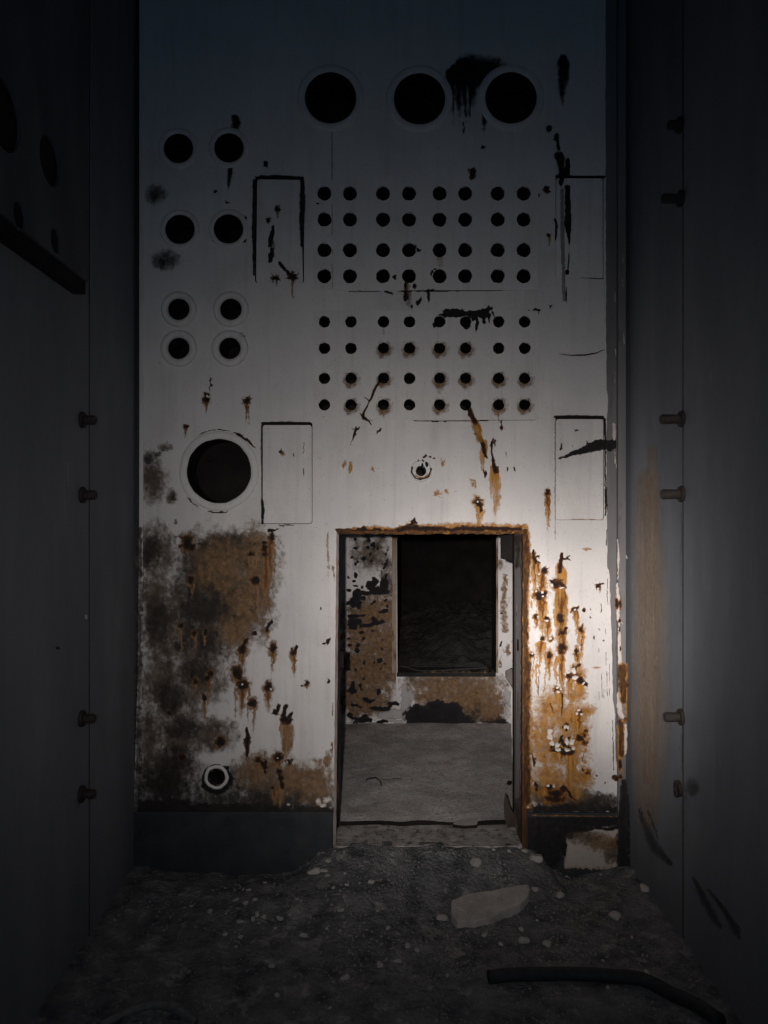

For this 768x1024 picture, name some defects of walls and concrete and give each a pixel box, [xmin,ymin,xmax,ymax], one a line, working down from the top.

leakage [446,54,501,134]
leakage [557,55,570,102]
leakage [546,125,565,186]
crack [342,381,380,473]
rust [159,396,312,804]
peeling [346,538,518,724]
rust [322,479,595,817]